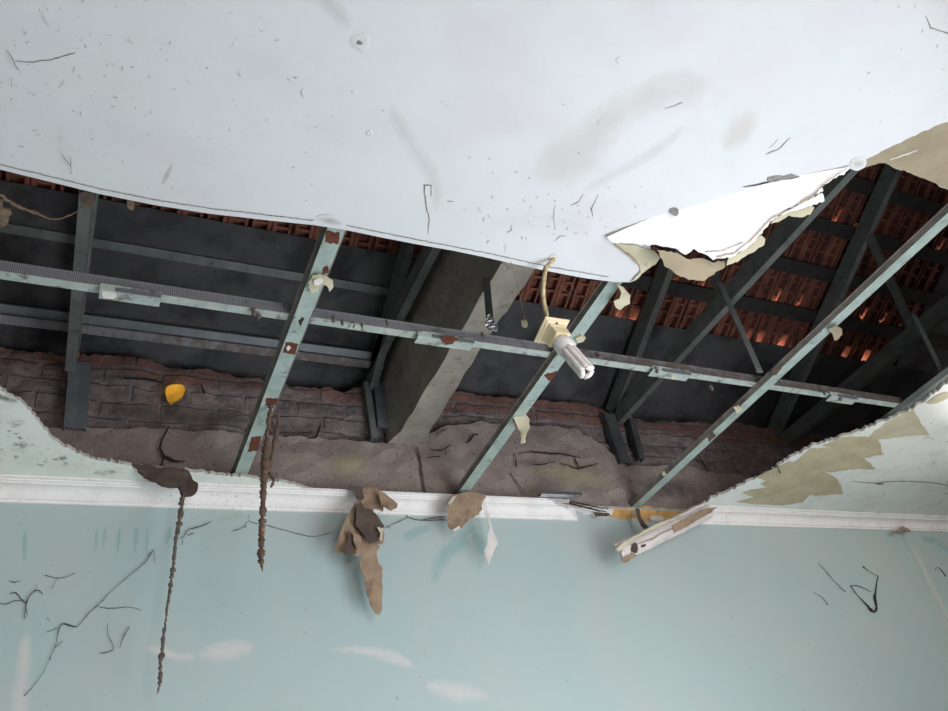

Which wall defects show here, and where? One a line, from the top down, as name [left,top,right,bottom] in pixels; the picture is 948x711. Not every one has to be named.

peeling [864,122,948,190]
peeling [767,174,800,182]
rust [283,342,299,355]
peeling [926,392,948,404]
rust [248,436,262,452]
peeling [738,409,929,506]